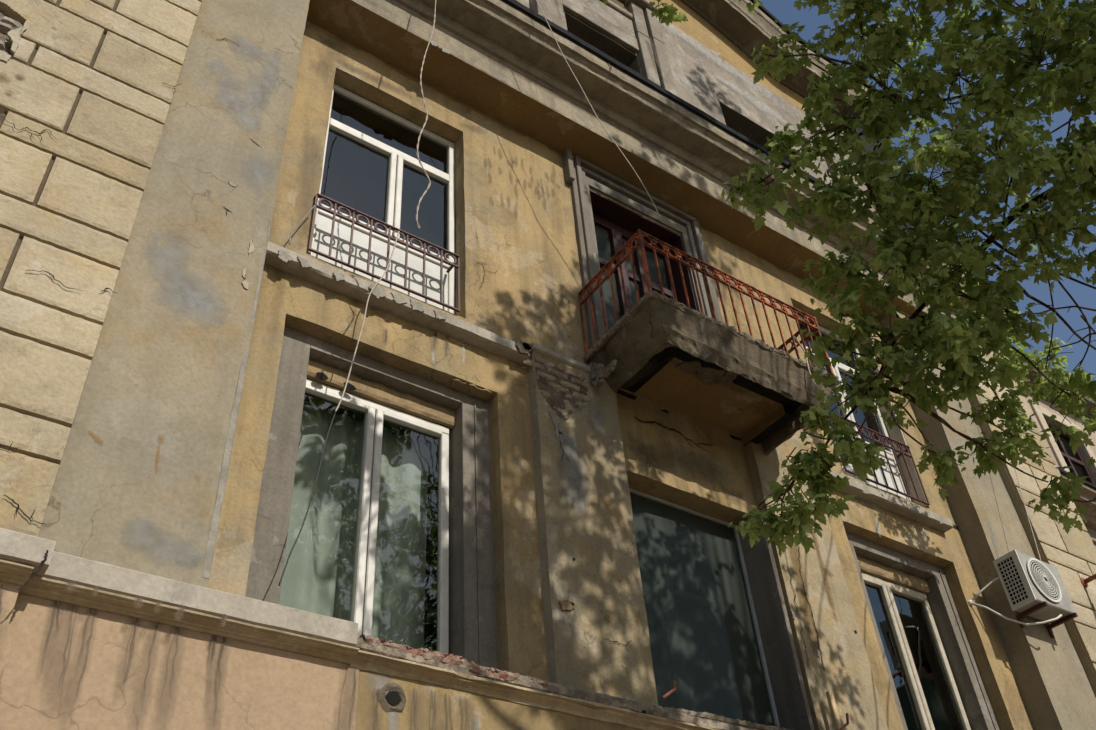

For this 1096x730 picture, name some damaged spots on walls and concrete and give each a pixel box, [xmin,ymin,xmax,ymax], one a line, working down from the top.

spalling [0,10,27,63]
spalling [515,341,618,420]
crack [634,416,713,452]
crack [4,495,48,590]
spalling [359,634,562,689]
spalling [376,683,406,712]
spalling [591,695,791,730]